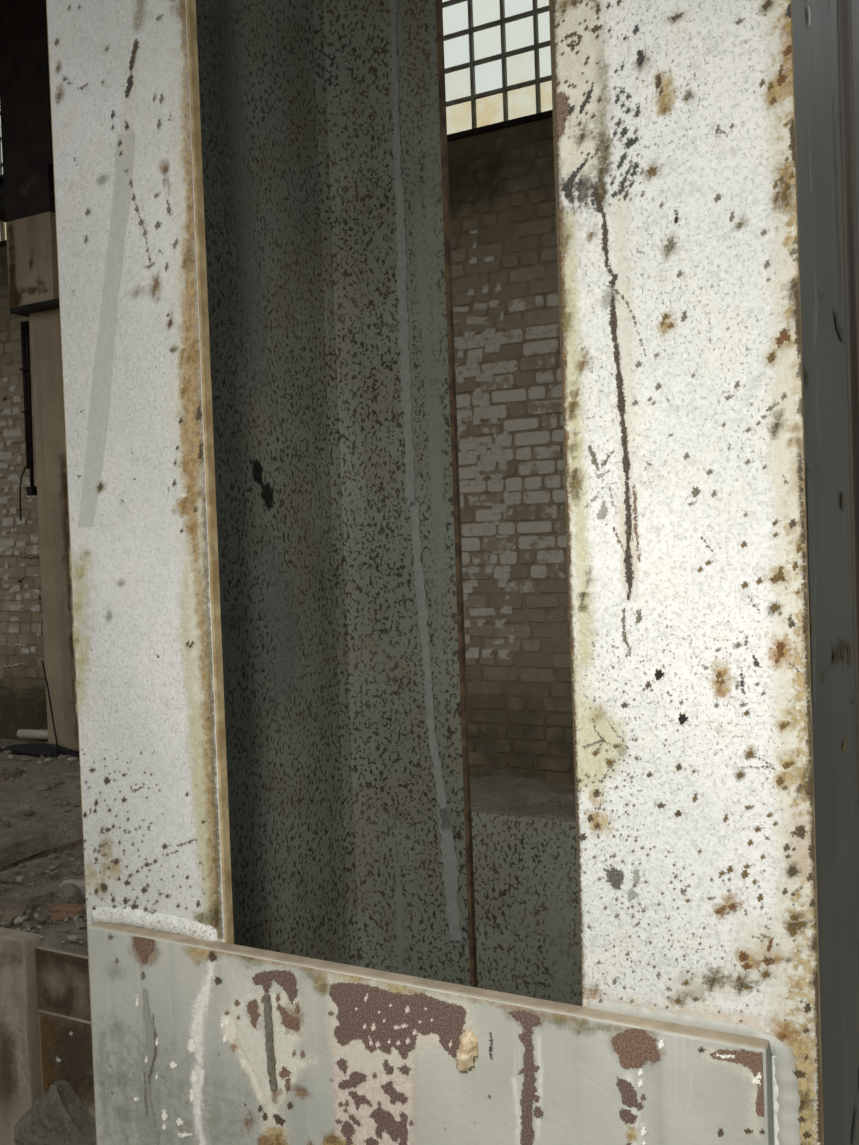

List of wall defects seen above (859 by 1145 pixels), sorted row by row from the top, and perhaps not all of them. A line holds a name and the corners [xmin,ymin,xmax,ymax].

rust [660,310,687,333]
rust [151,2,224,939]
rust [549,0,654,994]
crack [594,190,646,657]
rust [671,0,825,1145]
rust [188,946,217,964]
peeling [135,989,159,1145]
rust [245,1105,286,1145]
peeling [225,970,318,1145]
rust [309,1135,346,1145]
peeling [328,981,467,1145]